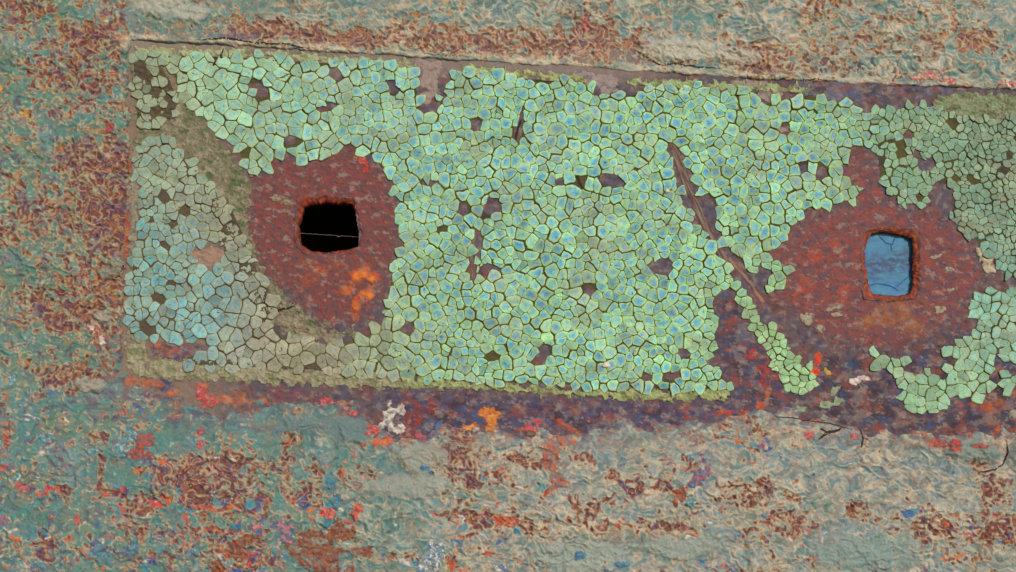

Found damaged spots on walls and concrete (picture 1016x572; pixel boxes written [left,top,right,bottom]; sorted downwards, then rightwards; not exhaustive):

crack [195,34,306,74]
crack [632,49,763,80]
rust [245,145,402,333]
peeling [122,49,1016,414]
rust [763,150,986,376]
rust [548,415,581,433]
rust [707,348,782,458]
rust [951,387,1016,434]